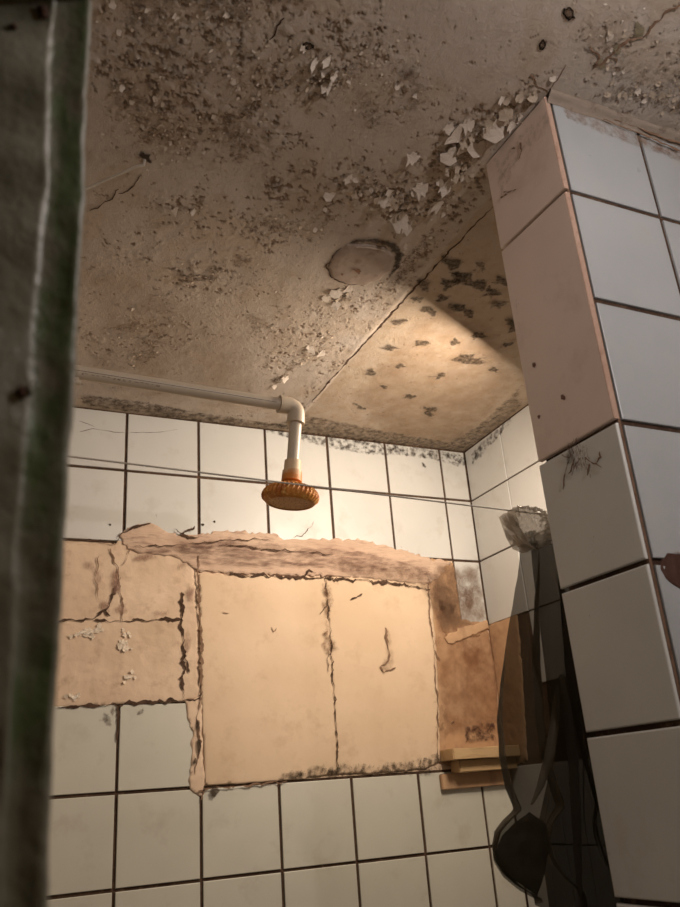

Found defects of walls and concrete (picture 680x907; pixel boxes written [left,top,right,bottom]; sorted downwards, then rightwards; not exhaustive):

peeling [87,0,451,190]
crack [589,46,618,69]
peeling [562,3,680,121]
peeling [322,76,556,316]
water stain [411,256,507,318]
water stain [452,355,498,371]
crack [58,523,441,801]
flaking render [55,523,510,797]
water stain [283,764,364,778]
water stain [379,754,439,773]